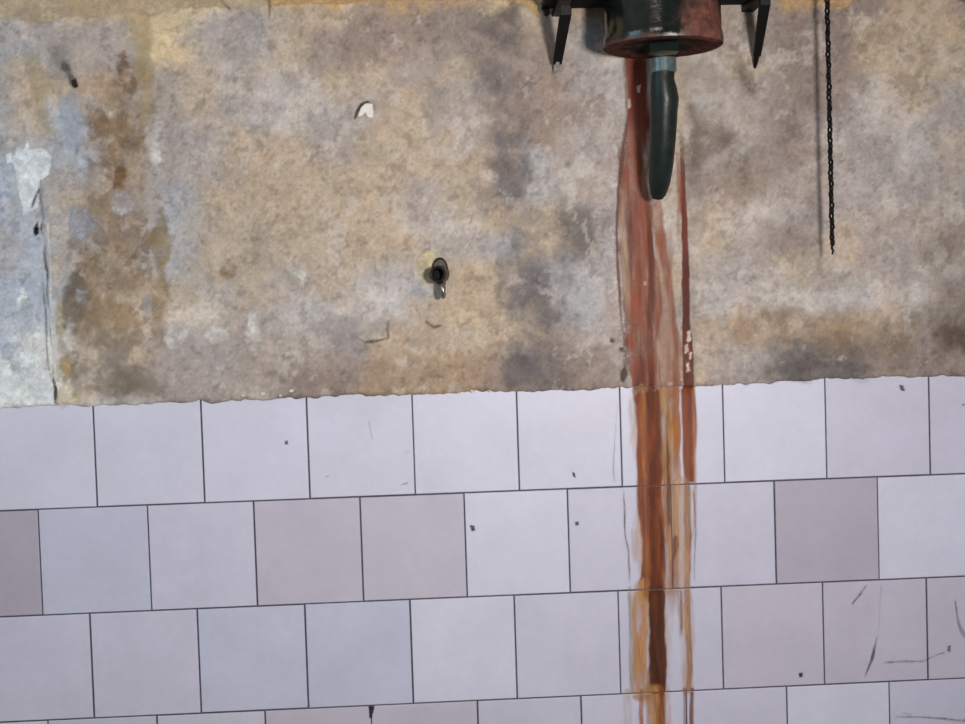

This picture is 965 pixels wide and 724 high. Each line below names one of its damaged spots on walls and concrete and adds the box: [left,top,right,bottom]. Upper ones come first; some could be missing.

damp [118,54,135,93]
peeling [0,350,40,407]
peeling [5,142,69,335]
damp [63,262,98,328]
damp [69,104,168,311]
rust [616,58,696,724]